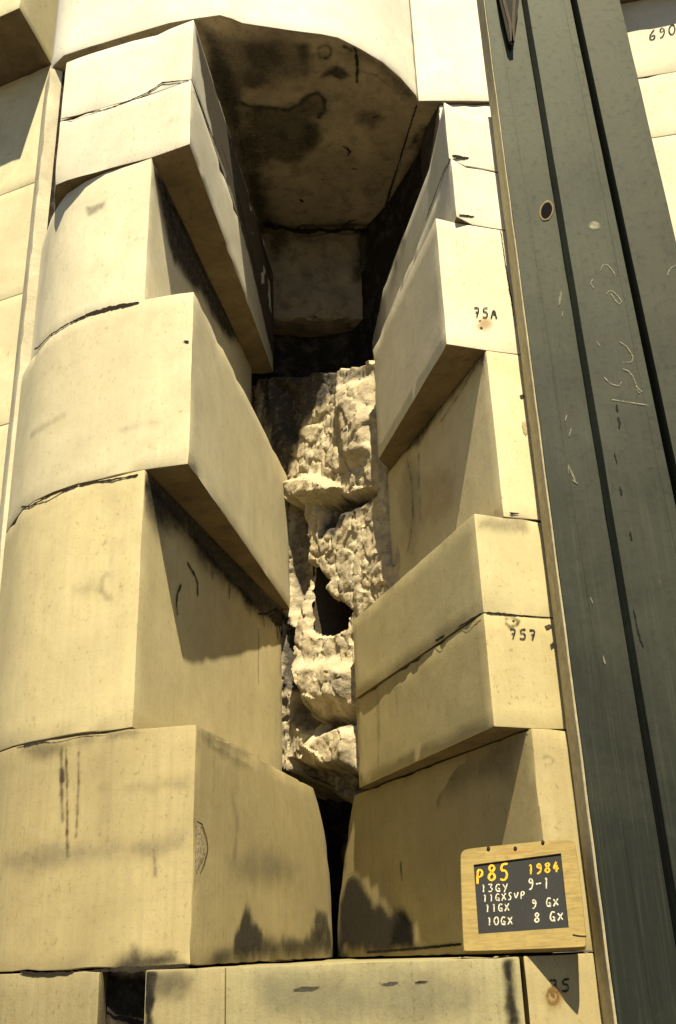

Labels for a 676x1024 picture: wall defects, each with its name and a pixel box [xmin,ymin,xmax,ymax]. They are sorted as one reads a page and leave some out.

crack [62,80,220,155]
leakage [195,27,359,356]
crack [34,302,139,350]
crack [21,474,138,508]
spalling [251,360,400,804]
crack [17,730,113,746]
leakage [60,750,79,849]